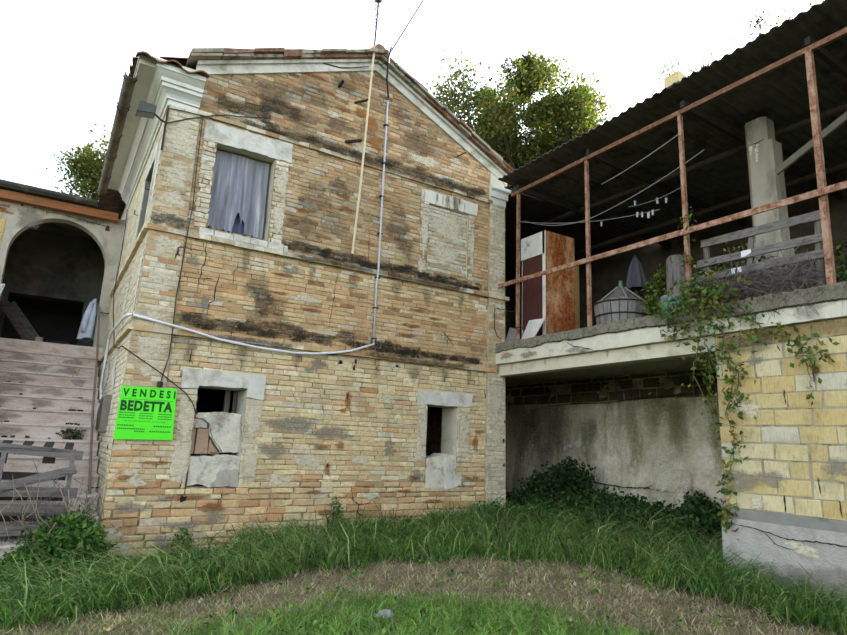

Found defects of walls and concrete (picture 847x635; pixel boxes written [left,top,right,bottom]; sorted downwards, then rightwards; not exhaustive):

leakage [215,96,486,198]
crack [175,242,238,319]
leakage [283,241,481,291]
leakage [179,313,479,368]
crack [729,522,847,551]